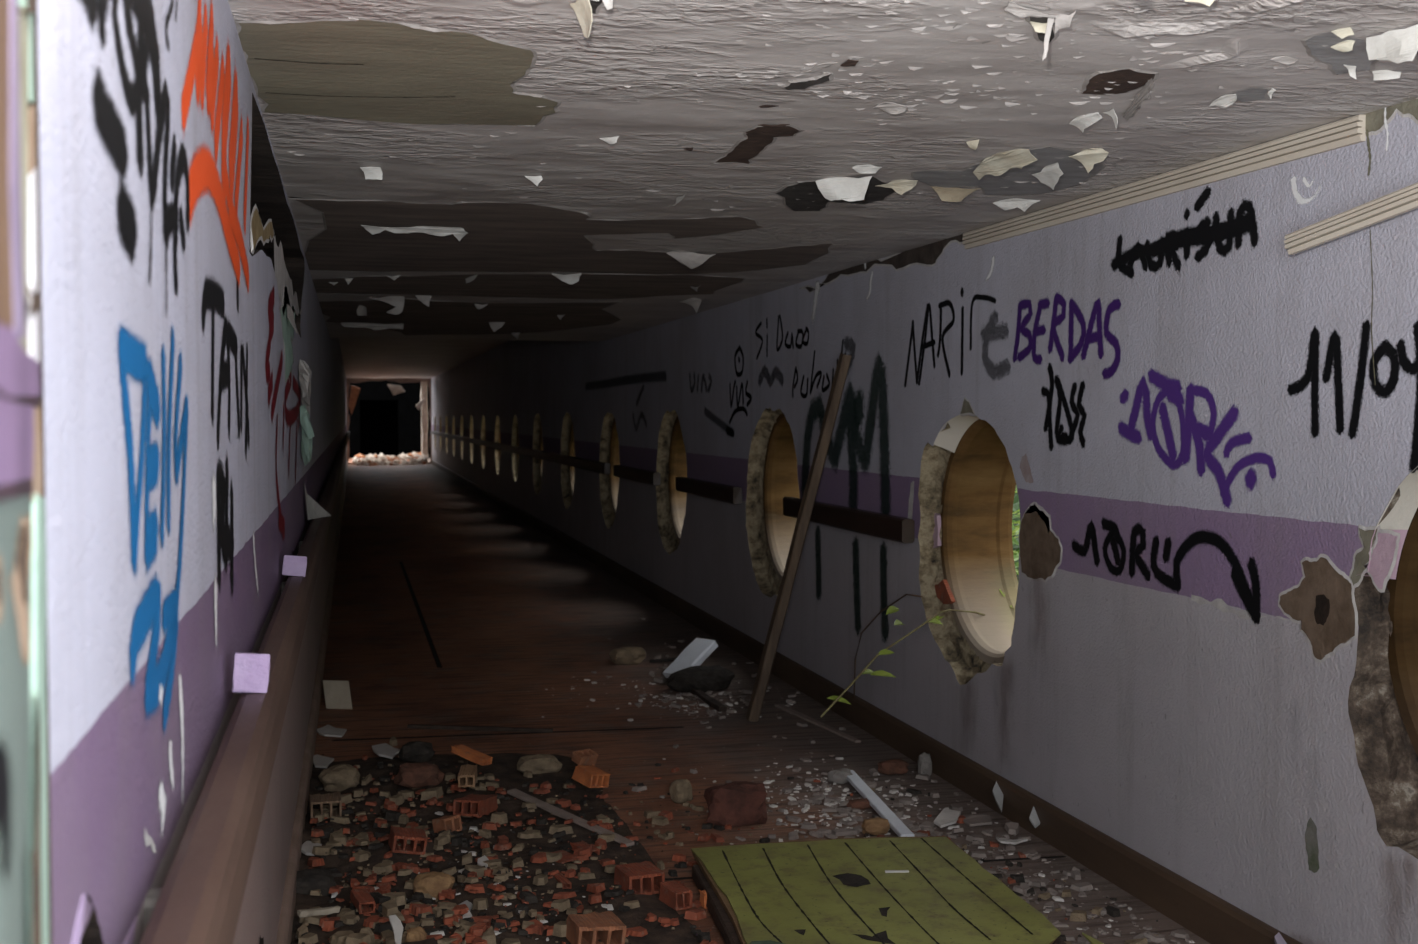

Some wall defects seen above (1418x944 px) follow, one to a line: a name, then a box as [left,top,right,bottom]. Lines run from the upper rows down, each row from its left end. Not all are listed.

peeling [570,0,613,38]
peeling [711,0,1215,215]
peeling [1202,22,1418,110]
peeling [234,18,835,466]
spalling [799,234,965,293]
spalling [746,408,786,597]
spalling [908,397,1063,685]
spalling [1191,488,1418,859]
spalling [71,893,104,944]